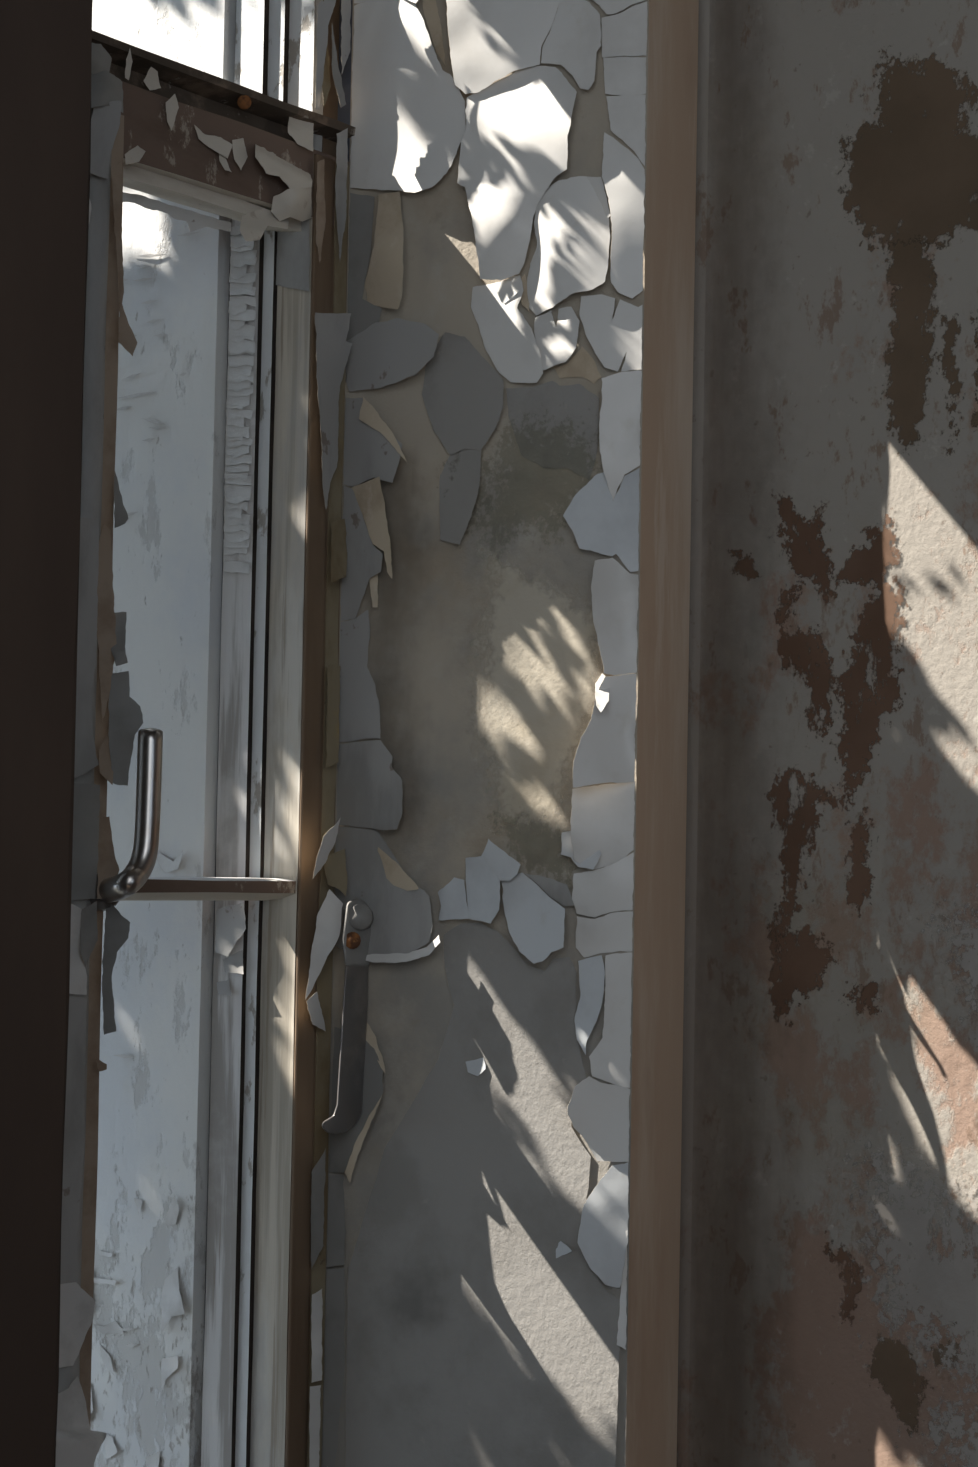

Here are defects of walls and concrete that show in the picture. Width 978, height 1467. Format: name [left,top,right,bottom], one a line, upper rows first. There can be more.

peeling [125,49,179,131]
peeling [194,125,248,172]
peeling [305,0,648,1467]